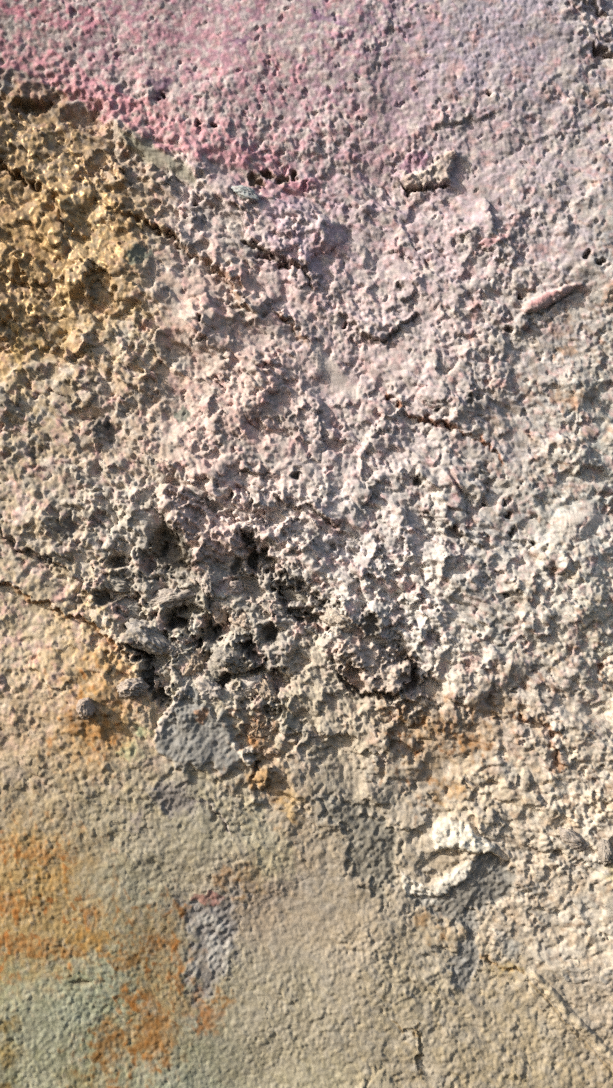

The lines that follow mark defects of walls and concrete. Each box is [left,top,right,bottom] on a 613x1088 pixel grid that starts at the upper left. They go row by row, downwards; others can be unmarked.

crack [113,198,318,349]
crack [337,310,420,345]
rust [0,615,281,1088]
spalling [0,483,524,995]